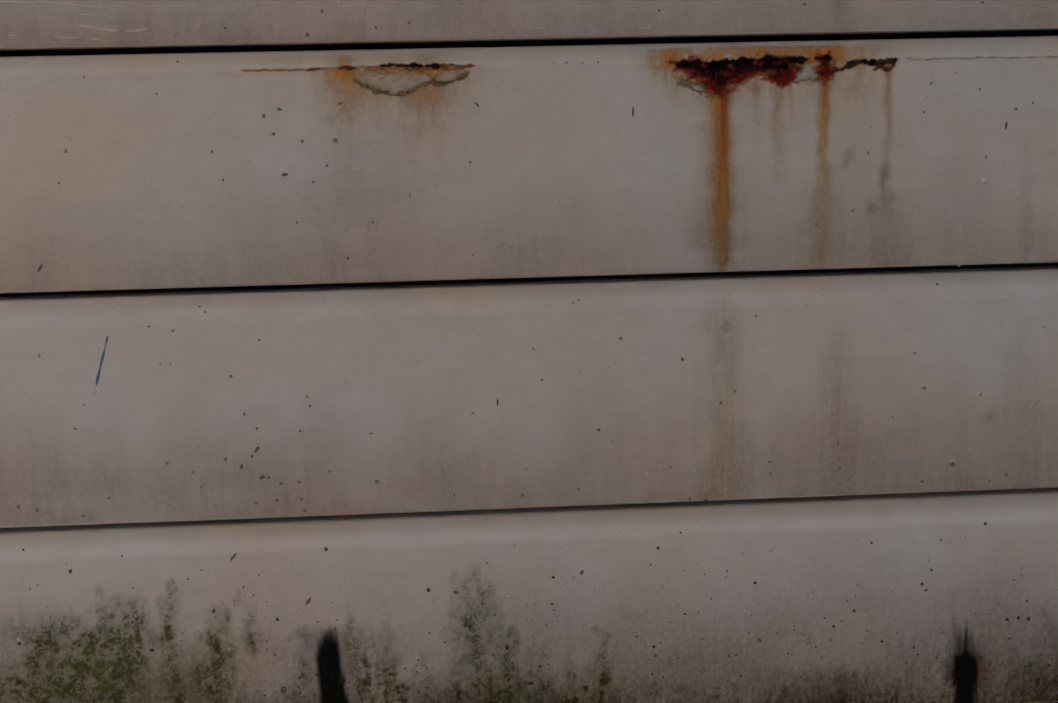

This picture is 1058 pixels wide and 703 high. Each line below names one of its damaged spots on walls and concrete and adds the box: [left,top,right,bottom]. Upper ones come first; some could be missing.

rust [242,58,474,109]
peeling [353,69,469,96]
rust [649,46,929,266]
leakage [317,634,348,703]
leakage [948,630,985,703]